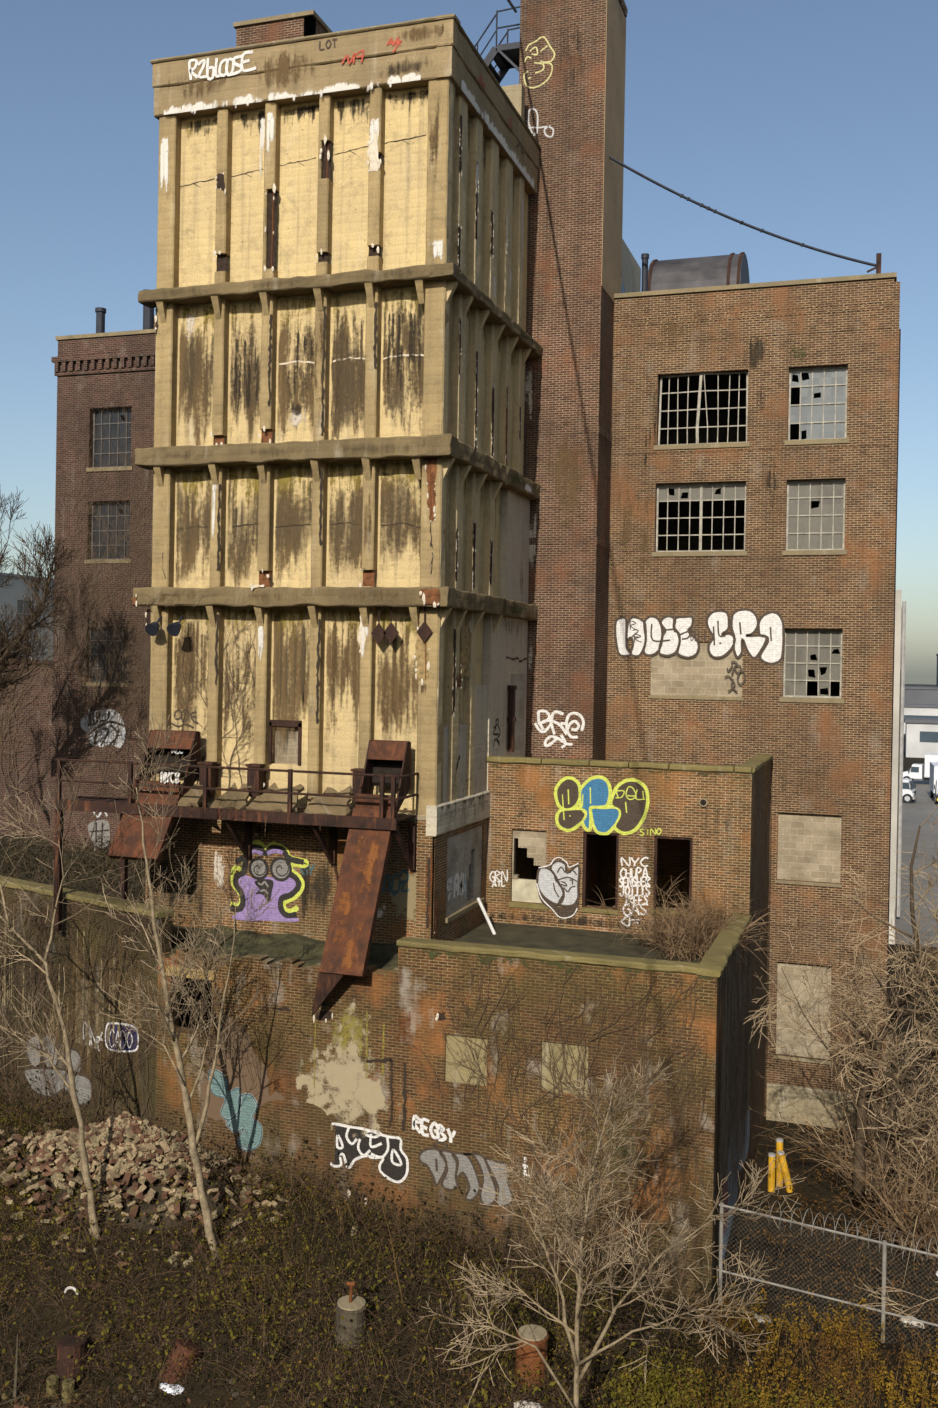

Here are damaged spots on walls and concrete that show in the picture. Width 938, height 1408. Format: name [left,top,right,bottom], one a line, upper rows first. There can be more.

water stain [164,51,439,171]
water stain [231,327,260,414]
water stain [288,313,365,430]
water stain [384,304,424,415]
water stain [177,479,258,566]
water stain [276,482,312,550]
water stain [333,473,416,557]
water stain [174,623,208,731]
water stain [224,594,309,752]
water stain [326,615,418,741]
corrosion [333,831,379,969]
spalling [313,1011,333,1023]